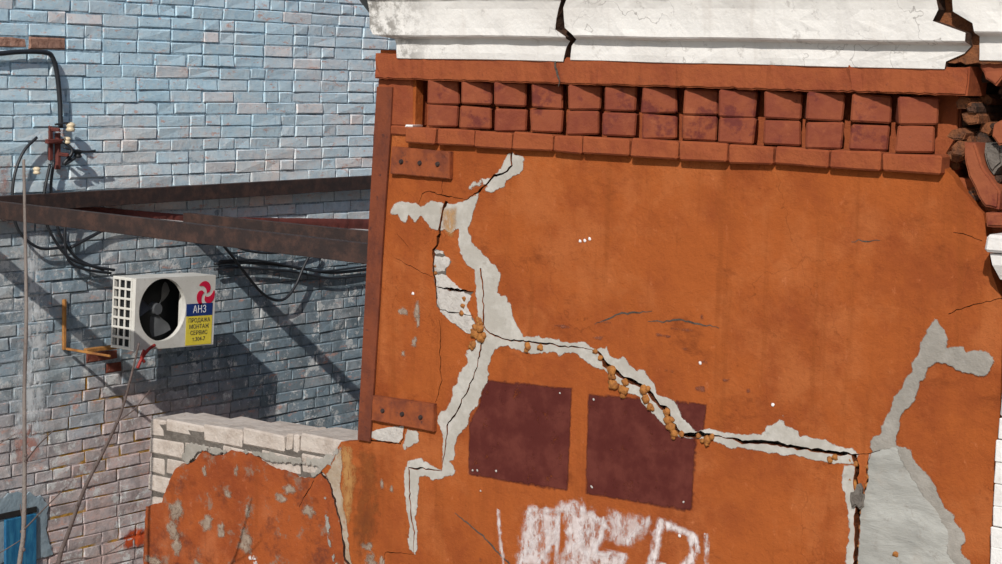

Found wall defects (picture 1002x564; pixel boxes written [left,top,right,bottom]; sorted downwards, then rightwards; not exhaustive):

spalling [432,249,476,334]
peeling [398,303,419,355]
crack [406,155,880,564]
peeling [166,500,183,555]
peeling [200,515,224,537]
peeling [238,505,257,564]
peeling [275,485,295,502]
crack [299,474,349,564]
spalling [850,483,865,509]